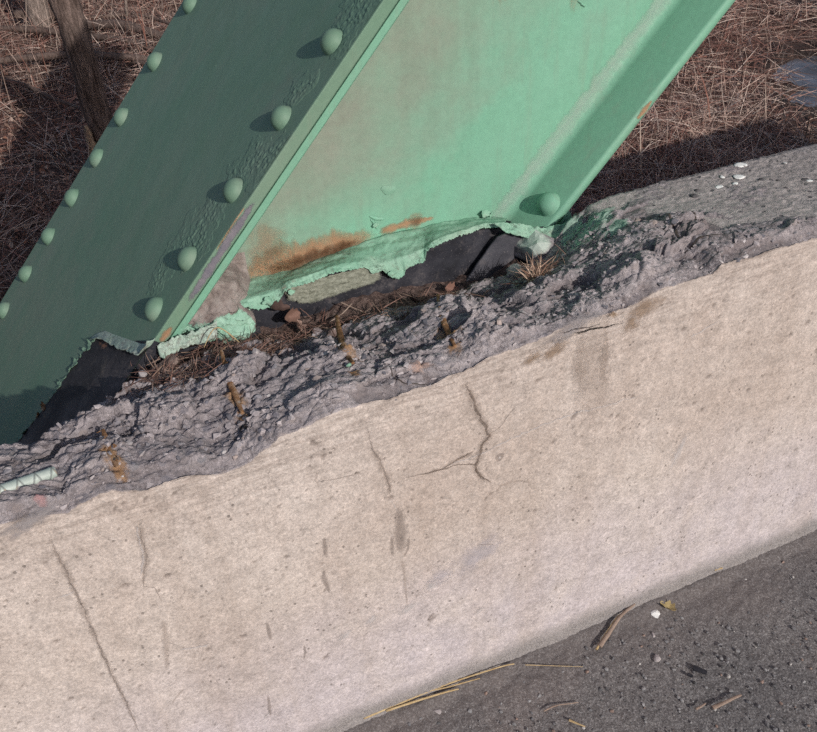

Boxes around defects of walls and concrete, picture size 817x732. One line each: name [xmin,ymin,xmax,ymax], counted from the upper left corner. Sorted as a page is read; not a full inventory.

rust [248,232,366,277]
rust [382,217,432,233]
spalling [0,181,817,524]
crack [412,390,491,482]